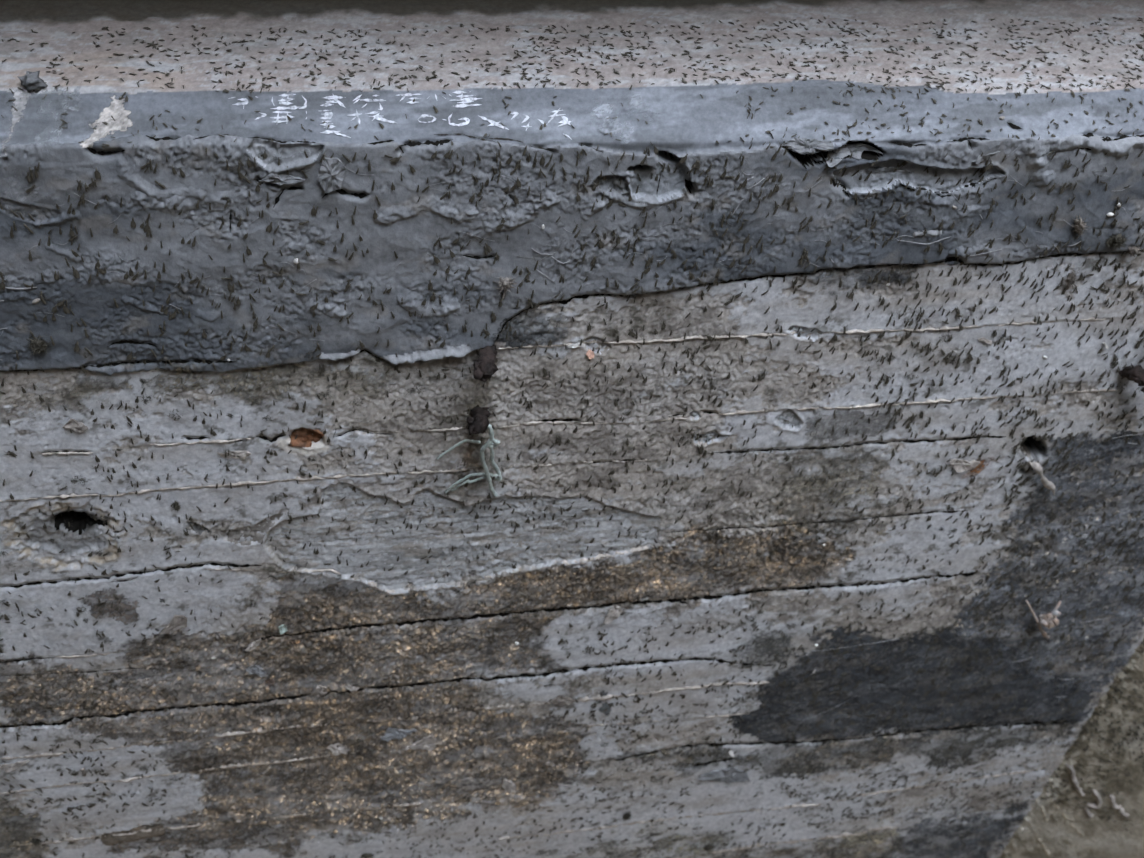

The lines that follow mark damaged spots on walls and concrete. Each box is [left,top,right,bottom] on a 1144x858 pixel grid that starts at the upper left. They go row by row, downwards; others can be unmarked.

peeling [247,140,346,193]
peeling [592,151,689,202]
peeling [782,138,1005,194]
spalling [0,198,61,222]
spalling [473,345,498,382]
spalling [568,337,610,359]
spalling [786,326,822,342]
damp [0,408,896,858]
damp [601,430,1144,787]
damp [773,800,1029,858]